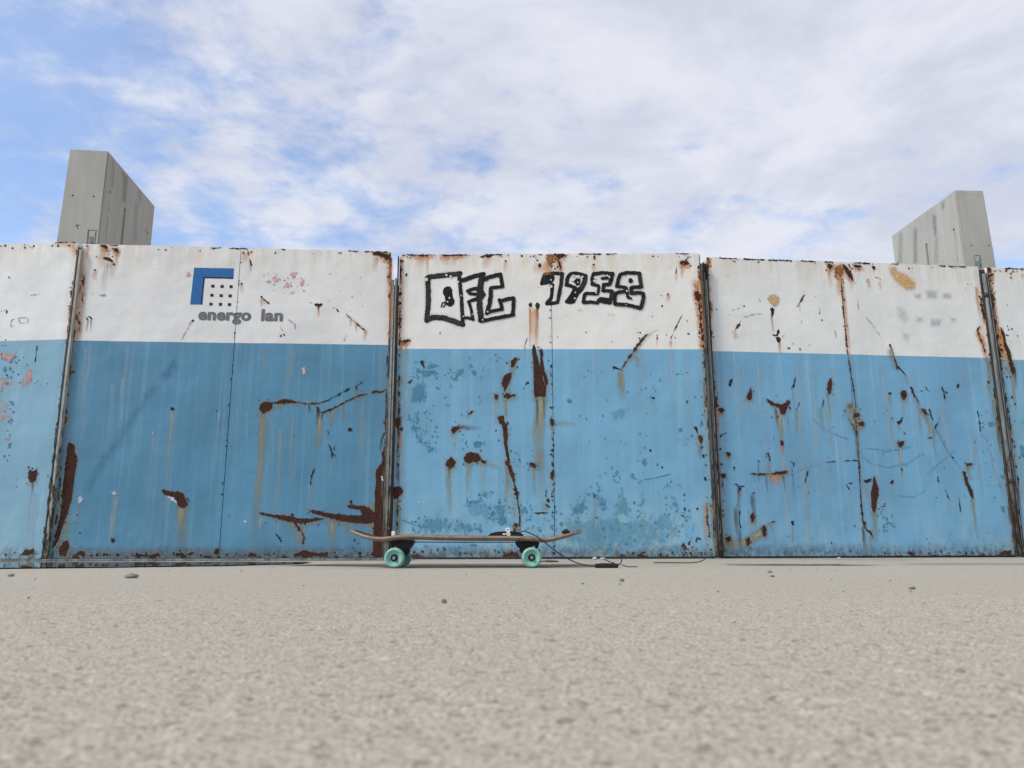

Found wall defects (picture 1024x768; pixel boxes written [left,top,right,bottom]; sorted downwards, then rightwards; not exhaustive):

peeling [263,272,339,313]
rust [891,263,915,289]
peeling [0,339,48,461]
rust [4,241,616,559]
rust [675,253,876,487]
rust [976,267,1024,510]
rust [871,476,885,526]